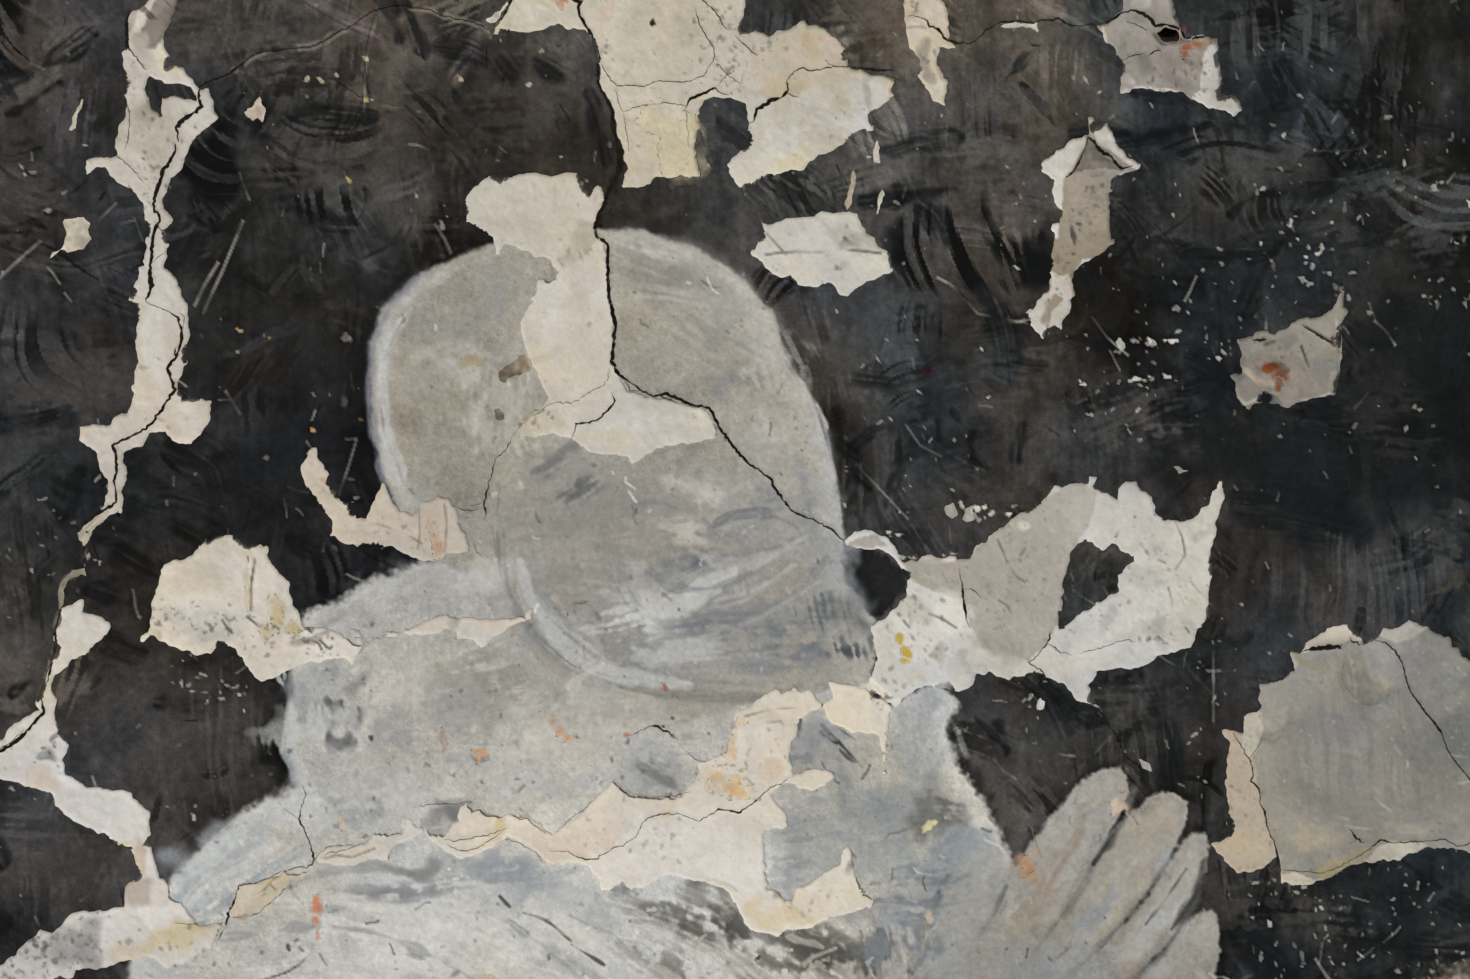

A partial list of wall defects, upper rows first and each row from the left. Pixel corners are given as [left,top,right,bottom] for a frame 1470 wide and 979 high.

flaking render [78,0,218,546]
crack [0,0,512,753]
flaking render [462,172,717,464]
crack [460,0,901,555]
flaking render [486,0,895,192]
flaking render [751,171,894,296]
flaking render [1025,116,1141,339]
crack [176,788,361,944]
crack [414,725,786,862]
flaking render [0,476,1225,979]
flaking render [1211,620,1470,886]
crack [1275,638,1470,780]